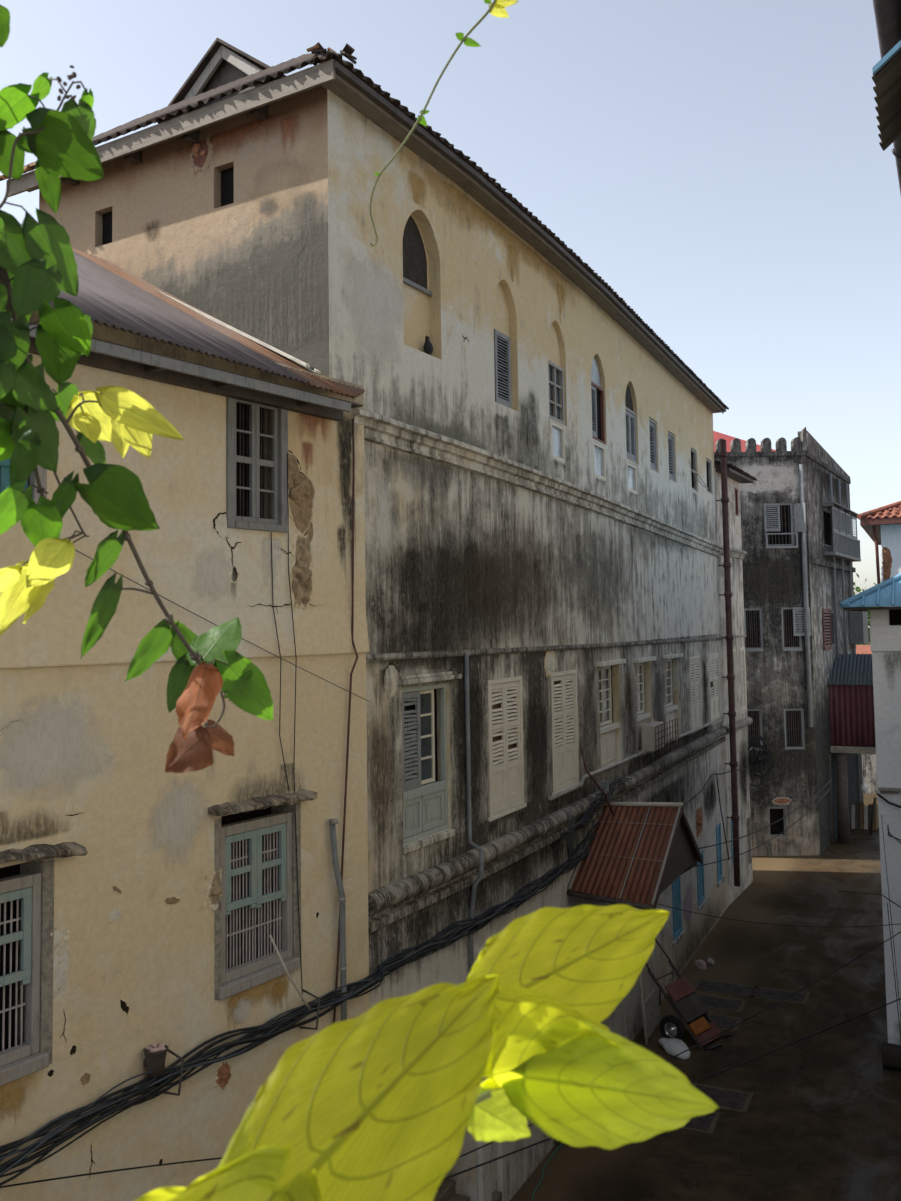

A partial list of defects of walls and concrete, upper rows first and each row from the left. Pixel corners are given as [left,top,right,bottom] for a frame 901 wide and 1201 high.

leakage [214,295,319,347]
leakage [410,419,481,448]
spalling [288,451,315,538]
leakage [376,456,461,552]
leakage [742,464,799,492]
crack [213,512,241,566]
leakage [743,557,802,602]
leakage [739,727,815,799]
peeling [50,928,71,999]